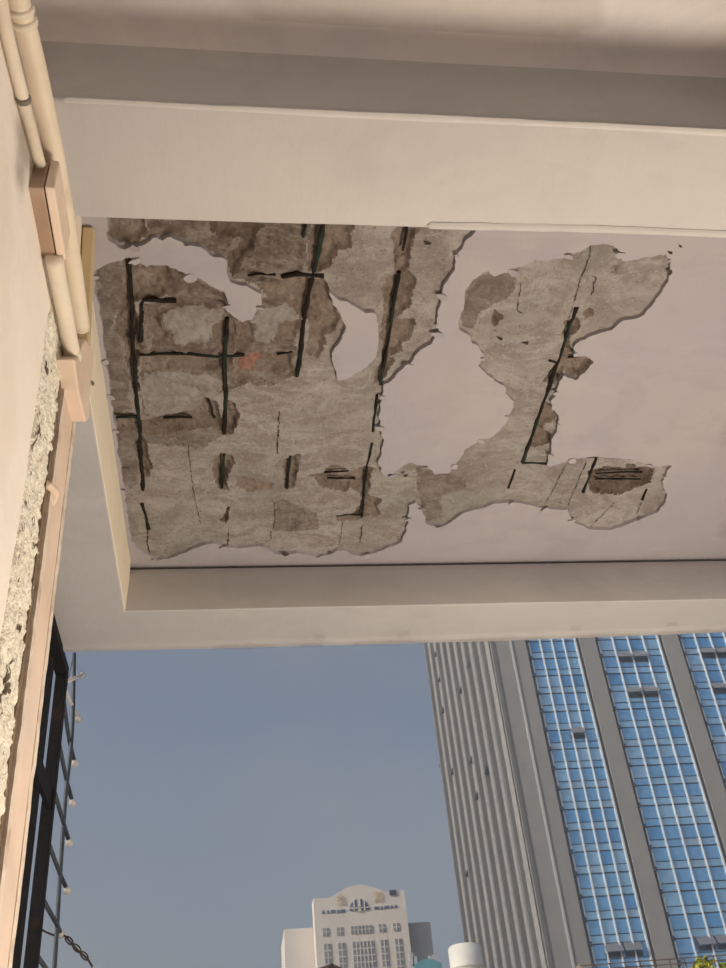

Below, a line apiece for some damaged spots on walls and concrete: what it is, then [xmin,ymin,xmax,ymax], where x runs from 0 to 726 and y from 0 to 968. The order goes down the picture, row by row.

spalling [93,217,682,560]